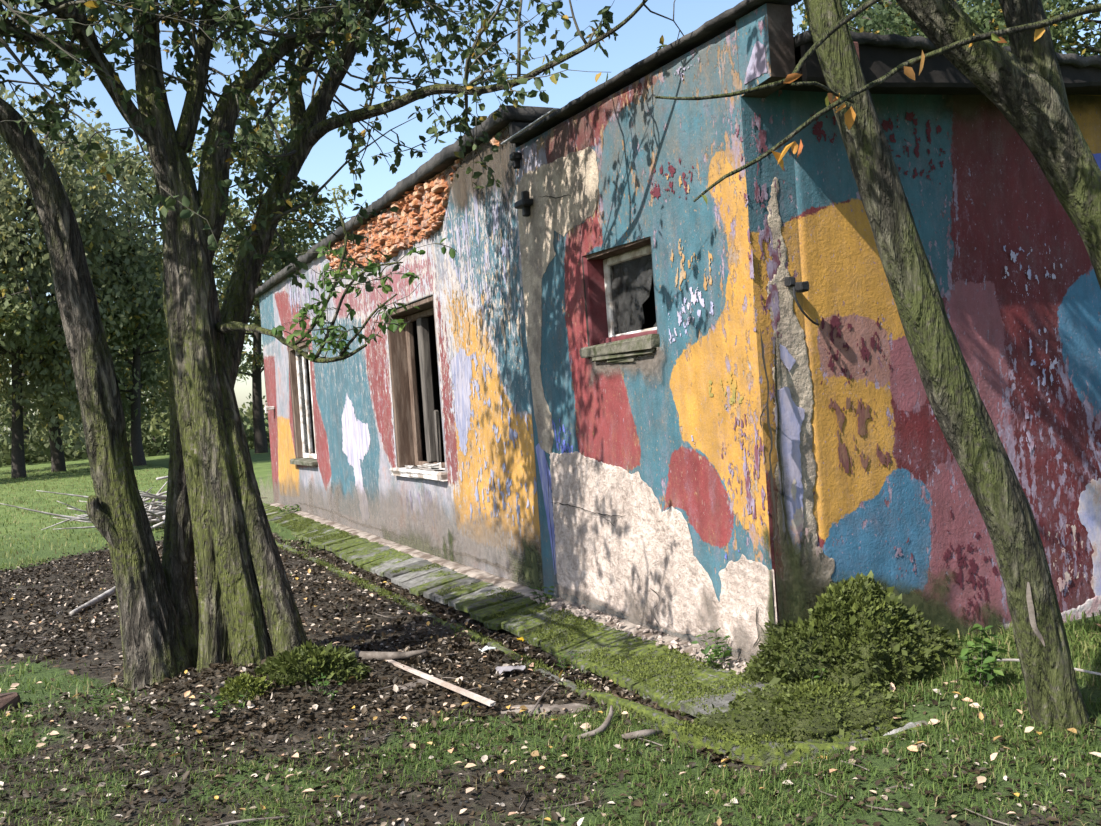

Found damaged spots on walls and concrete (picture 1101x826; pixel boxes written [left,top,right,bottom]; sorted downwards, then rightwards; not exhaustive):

peeling [881,112,950,229]
peeling [1003,244,1062,296]
spalling [286,112,837,657]
peeling [821,308,891,474]
peeling [1023,408,1036,453]
peeling [1029,328,1060,404]
crack [546,462,626,576]
peeling [1048,442,1101,623]